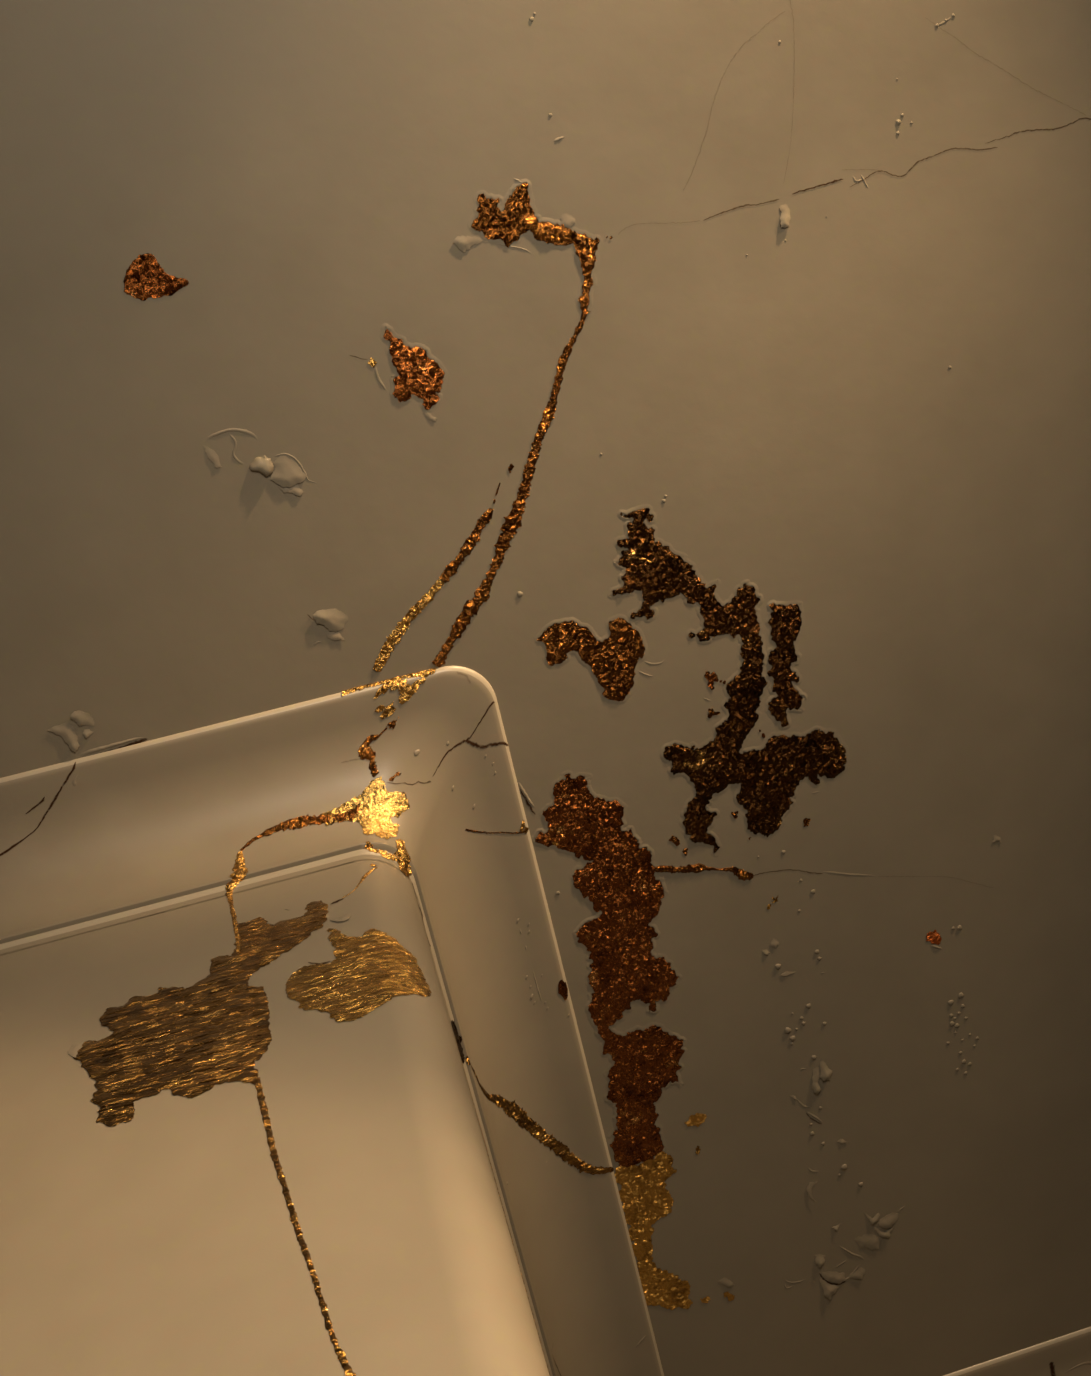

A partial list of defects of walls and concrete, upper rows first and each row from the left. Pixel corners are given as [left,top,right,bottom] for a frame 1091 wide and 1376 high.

crack [705,118,1090,220]
peeling [203,428,316,496]
peeling [308,609,349,646]
crack [225,310,590,957]
peeling [47,711,94,752]
crack [0,737,147,856]
crack [653,863,875,881]
peeling [67,1042,83,1058]
crack [254,1077,356,1376]
crack [451,1020,614,1375]
peeling [784,1206,905,1301]
crack [1049,1361,1091,1376]